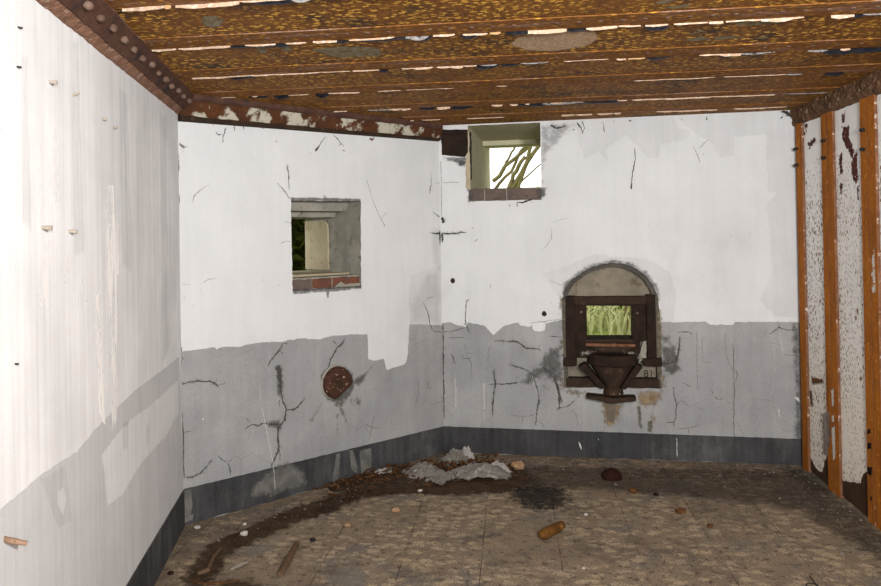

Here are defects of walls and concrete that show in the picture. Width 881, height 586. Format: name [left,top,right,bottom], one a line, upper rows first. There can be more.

peeling [511,31,599,51]
crack [182,413,232,478]
crack [245,343,305,464]
crack [416,297,578,426]